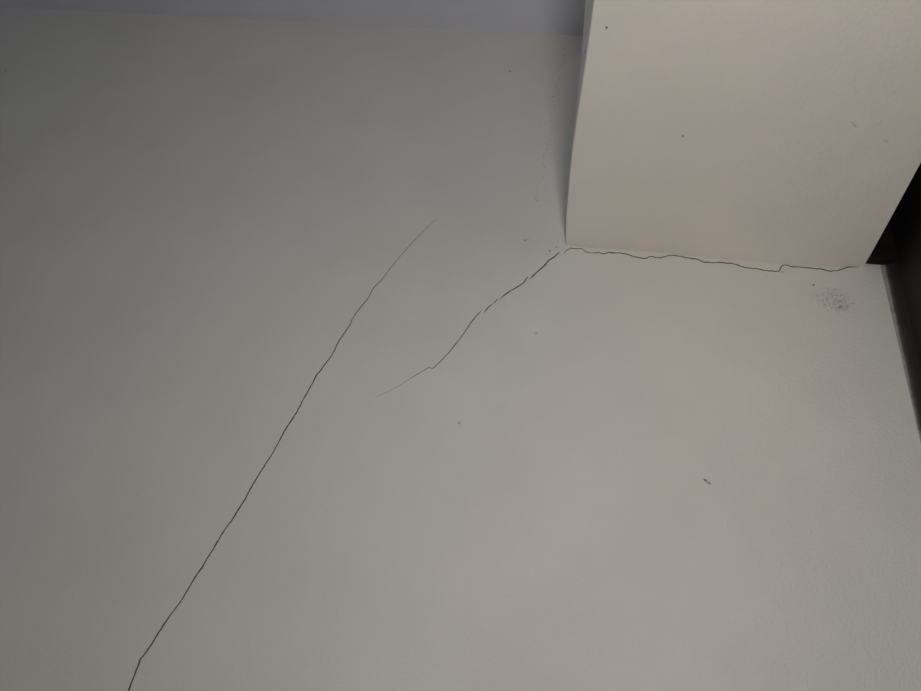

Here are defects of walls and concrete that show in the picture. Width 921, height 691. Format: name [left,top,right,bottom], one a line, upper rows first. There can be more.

crack [128,224,431,691]
crack [383,248,852,394]